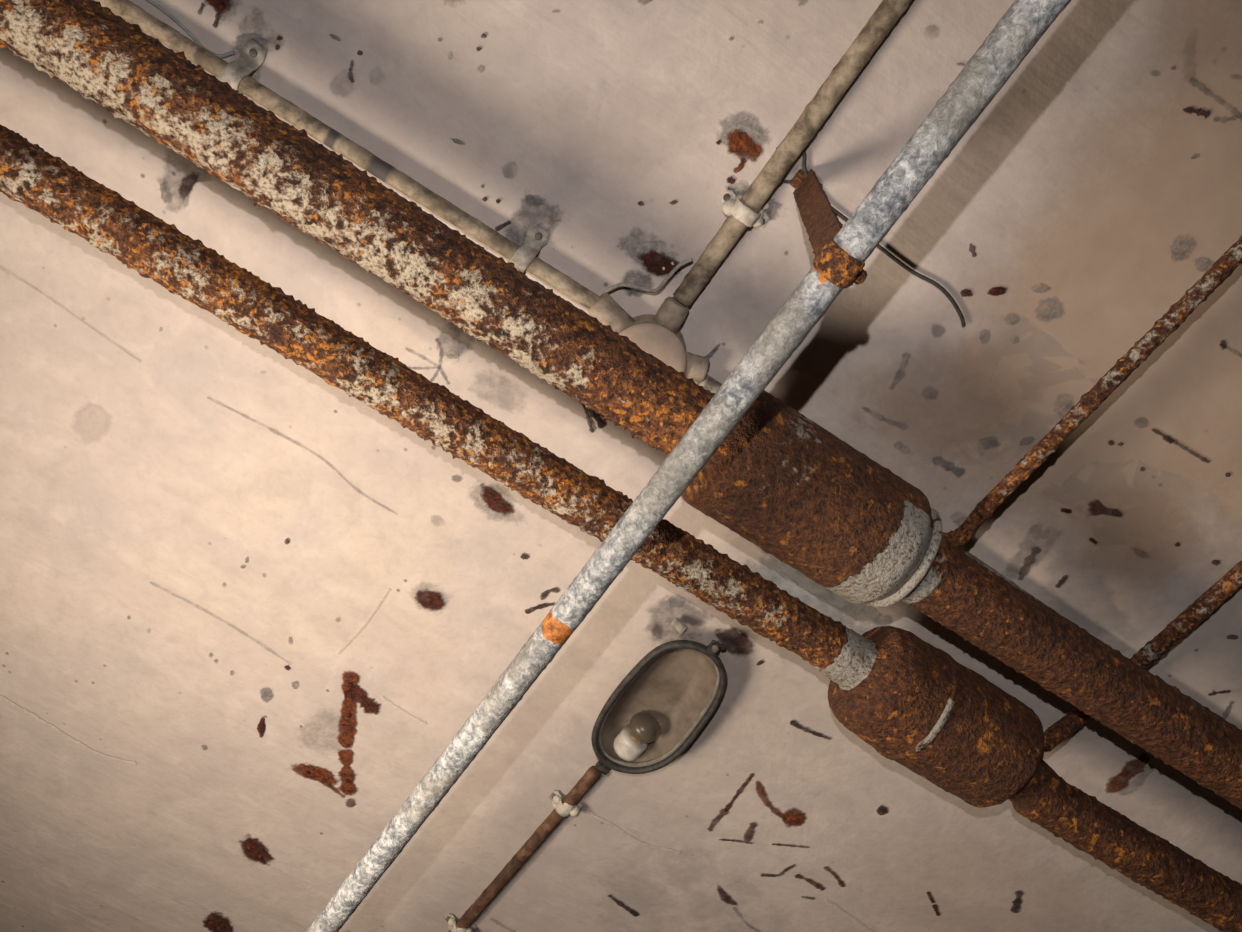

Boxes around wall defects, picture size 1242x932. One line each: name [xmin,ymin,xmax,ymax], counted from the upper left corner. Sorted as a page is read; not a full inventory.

rust [292,672,380,807]
rust [708,774,806,844]
rust [761,865,845,900]